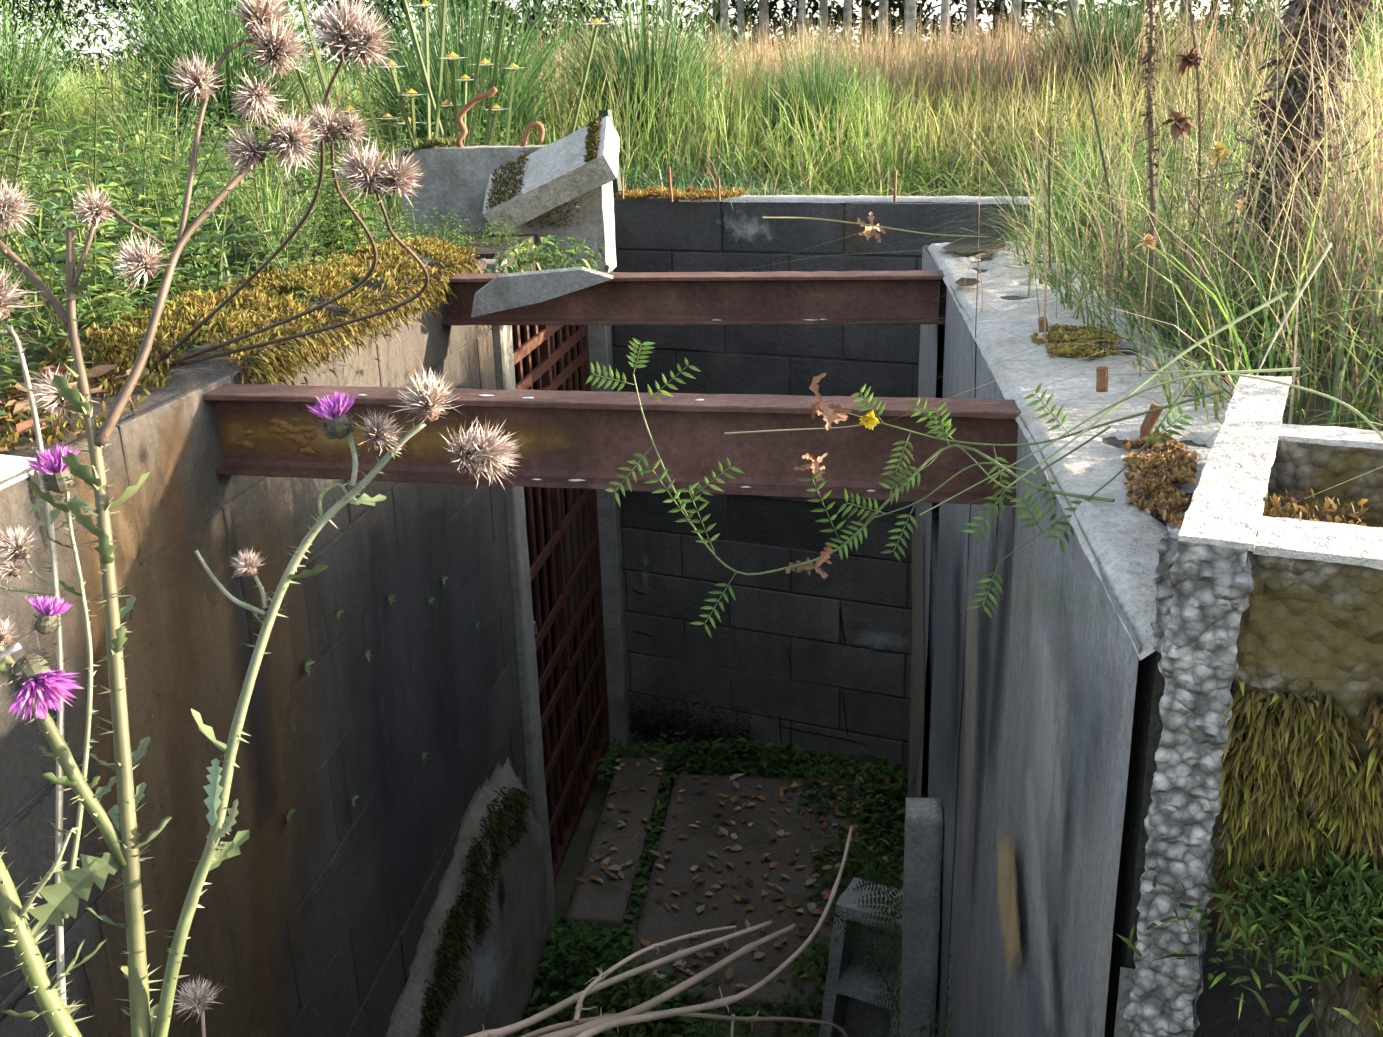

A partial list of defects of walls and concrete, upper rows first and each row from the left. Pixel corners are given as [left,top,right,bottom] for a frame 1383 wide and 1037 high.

rust [224,418,561,456]
rust [997,837,1019,972]
water stain [471,948,502,1009]